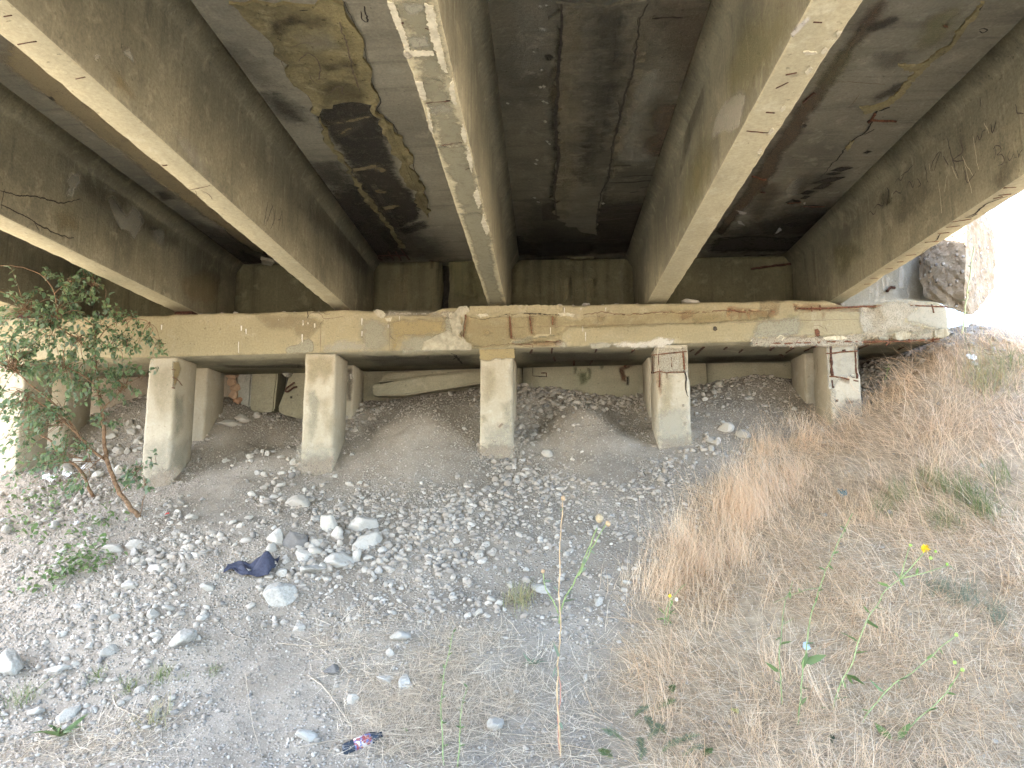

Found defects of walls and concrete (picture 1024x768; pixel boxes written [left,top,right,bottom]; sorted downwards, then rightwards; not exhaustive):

crack [0,189,79,239]
peeling [373,0,584,361]
crack [546,4,563,216]
crack [565,4,679,260]
crack [821,81,890,177]